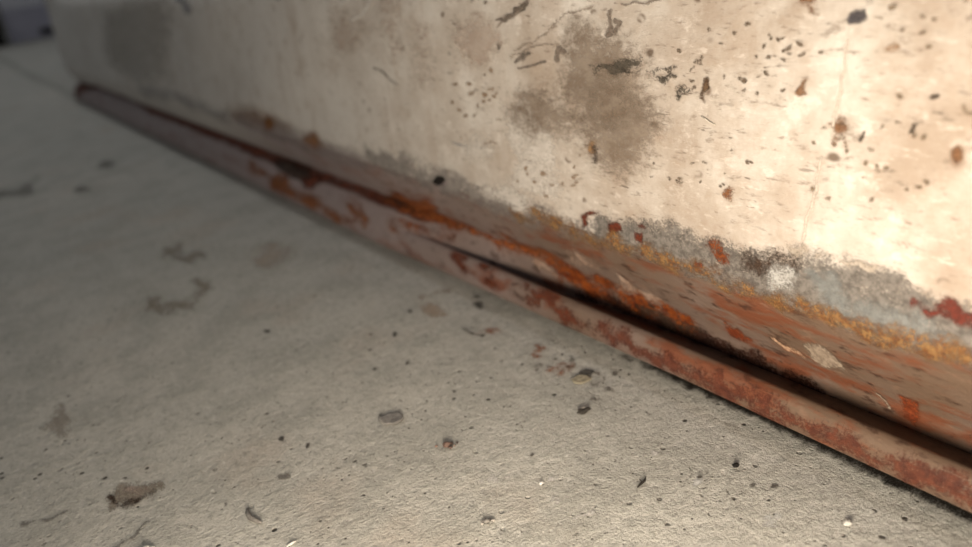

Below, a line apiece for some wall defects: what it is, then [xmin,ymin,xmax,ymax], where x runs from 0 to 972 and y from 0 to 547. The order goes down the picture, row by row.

rust [74,84,972,509]